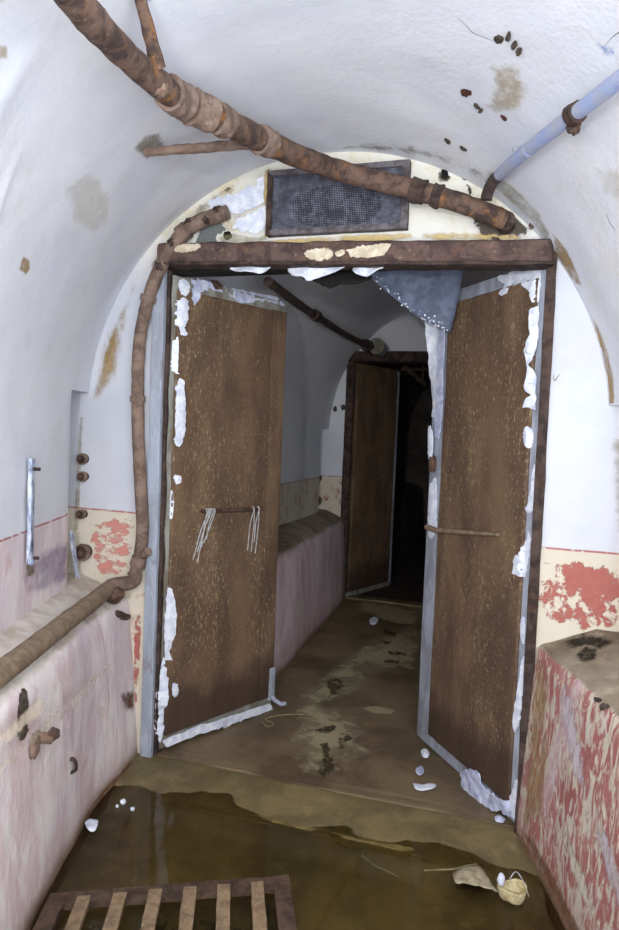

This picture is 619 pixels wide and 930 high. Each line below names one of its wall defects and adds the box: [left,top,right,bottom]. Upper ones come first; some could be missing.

flaking render [174,169,411,281]
flaking render [427,218,534,240]
damp [98,335,116,393]
peeling [90,518,134,575]
peeling [538,561,619,630]
peeling [0,667,107,769]